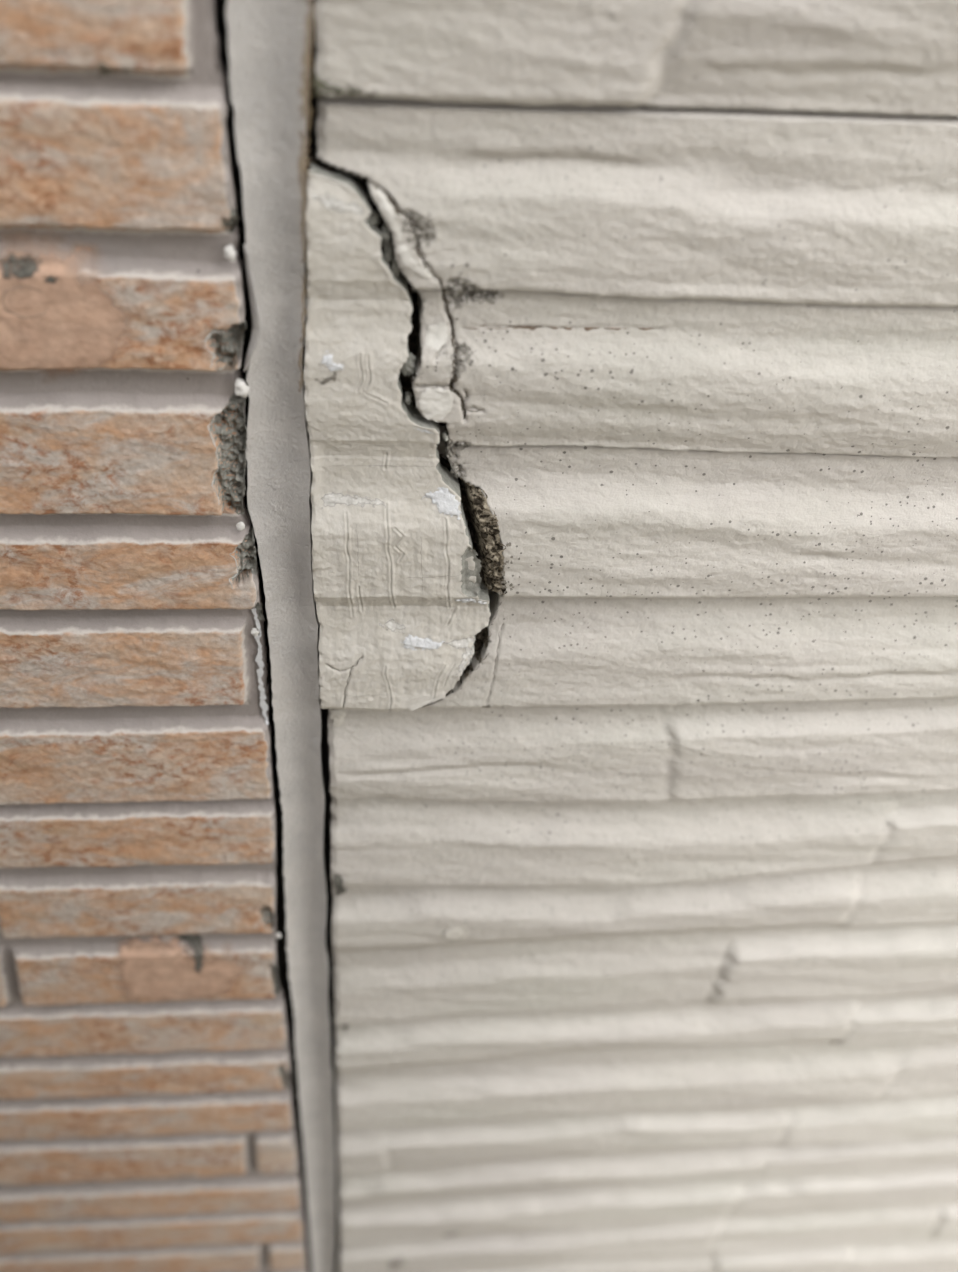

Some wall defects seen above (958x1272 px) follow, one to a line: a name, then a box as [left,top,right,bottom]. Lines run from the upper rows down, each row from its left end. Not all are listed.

crack [306,67,659,707]